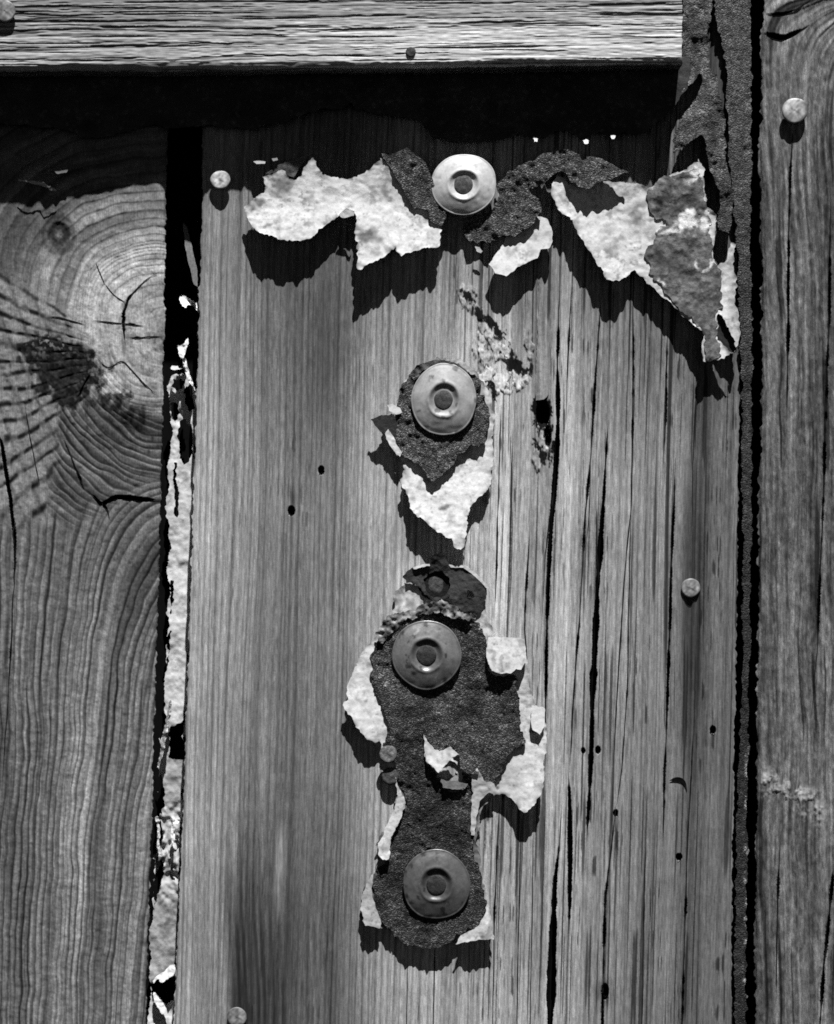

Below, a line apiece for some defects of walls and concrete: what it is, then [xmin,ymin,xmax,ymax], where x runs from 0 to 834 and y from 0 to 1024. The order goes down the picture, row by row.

crack [49,264,162,396]
peeling [458,282,535,396]
crack [64,440,157,519]
crack [492,288,634,1024]